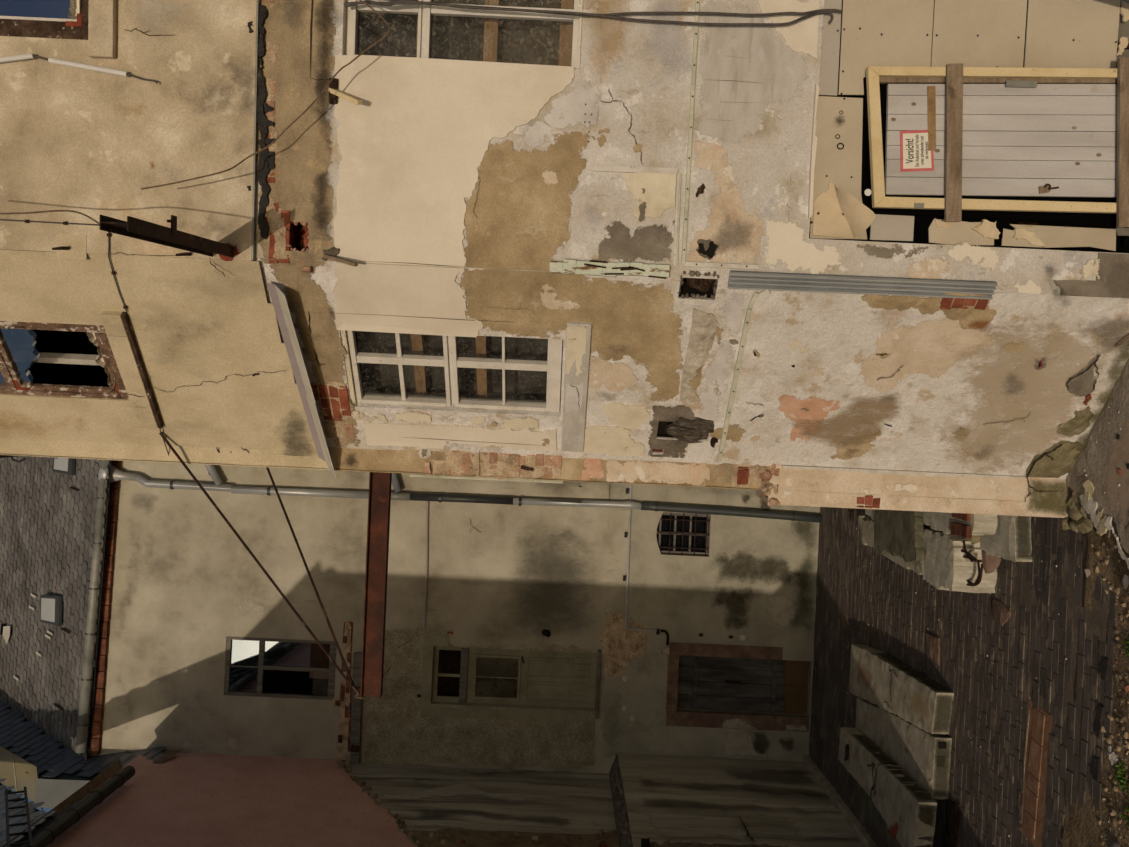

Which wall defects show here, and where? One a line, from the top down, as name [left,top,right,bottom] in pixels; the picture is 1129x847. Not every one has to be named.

peeling [257,0,841,507]
peeling [856,242,1000,279]
flaking render [859,293,1025,393]
crack [128,371,279,408]
flaking render [831,424,892,460]
peeling [952,427,970,441]
spalling [1025,354,1099,478]
damp [715,554,796,628]